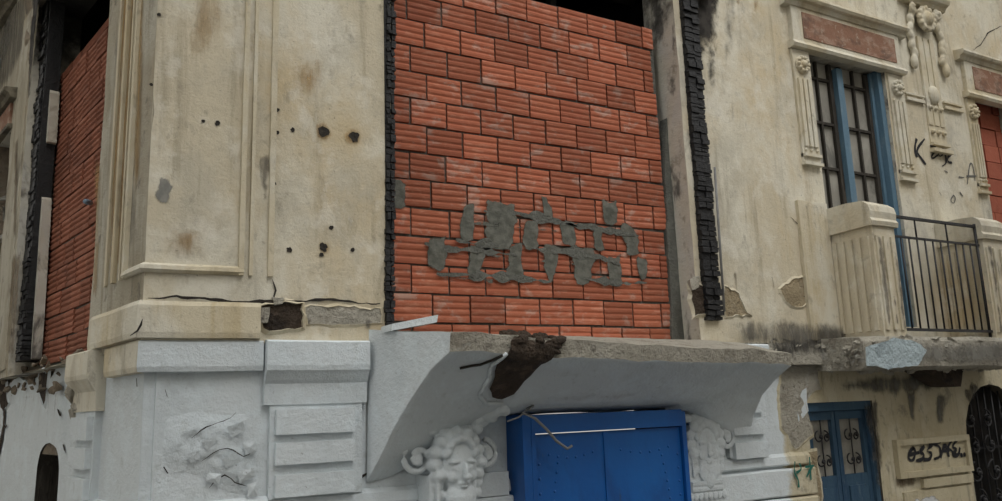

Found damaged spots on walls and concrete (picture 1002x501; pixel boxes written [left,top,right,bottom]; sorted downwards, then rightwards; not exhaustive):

crack [130,279,380,336]
spalling [778,275,806,310]
spalling [478,329,567,405]
crack [0,408,8,449]
spalling [0,380,10,412]
spalling [37,368,77,420]
spalling [777,334,1000,501]